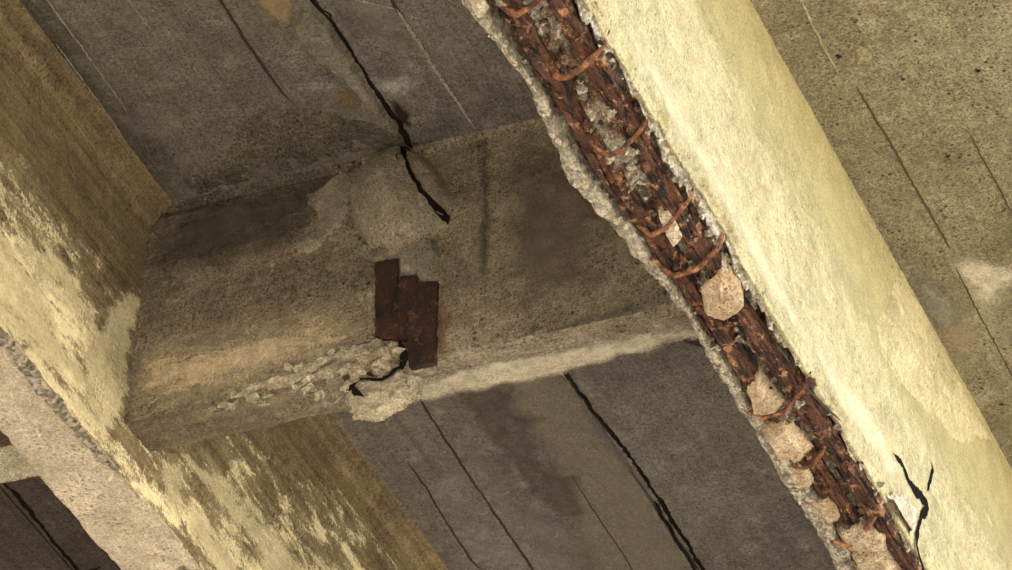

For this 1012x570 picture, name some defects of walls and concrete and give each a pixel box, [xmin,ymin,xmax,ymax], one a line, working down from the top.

crack [3,483,102,570]
crack [309,0,450,224]
crack [356,0,475,129]
crack [563,371,705,570]
spalling [461,0,926,570]
crack [774,342,842,422]
crack [800,0,1012,376]
crack [894,454,934,570]